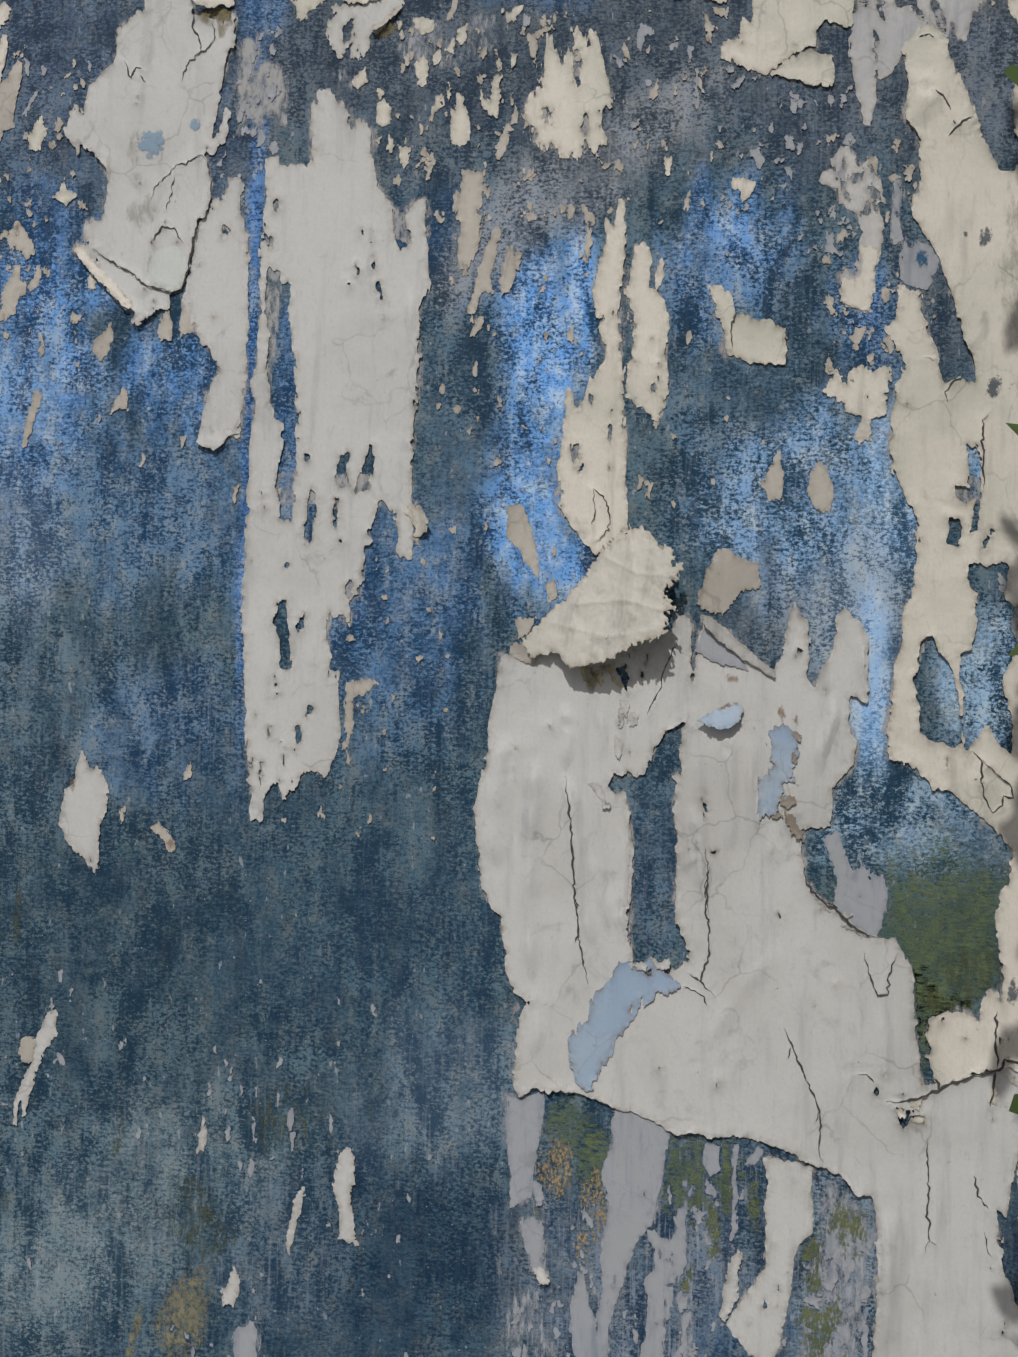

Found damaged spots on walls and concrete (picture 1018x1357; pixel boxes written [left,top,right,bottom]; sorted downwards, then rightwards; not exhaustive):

crack [182,13,215,79]
crack [93,155,204,293]
peeling [0,0,672,822]
peeling [472,0,1018,1357]
peeling [58,751,126,873]
peeling [150,821,176,853]
leakage [907,904,1018,1068]
peeling [277,1093,310,1151]
crack [785,1030,823,1165]
crack [860,1014,1018,1104]
peeling [326,1147,359,1246]
leakage [537,1129,608,1264]